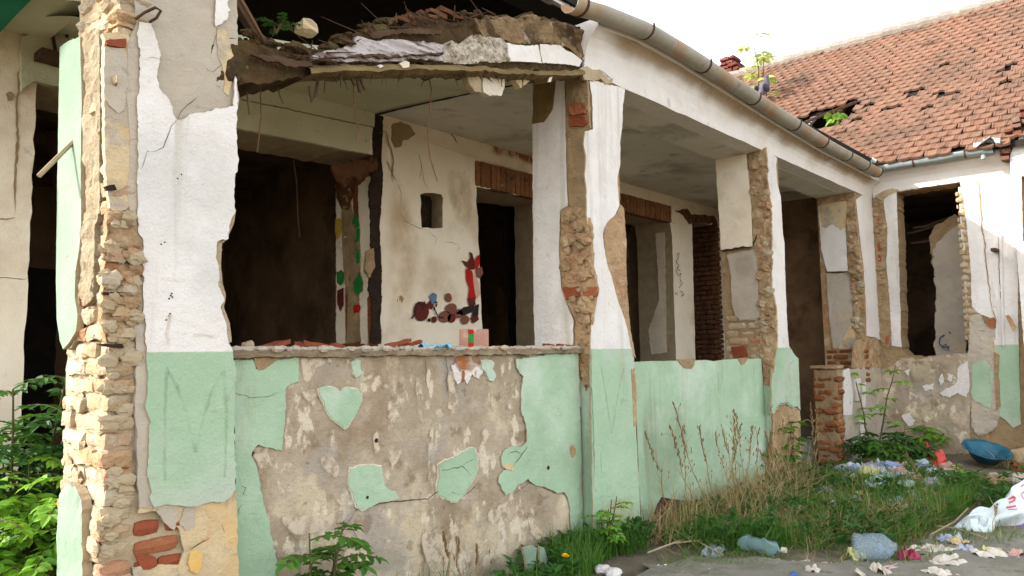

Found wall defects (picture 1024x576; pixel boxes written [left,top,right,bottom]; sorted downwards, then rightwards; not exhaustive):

flaking render [102,39,128,114]
spalling [98,210,148,352]
peeling [252,115,570,576]
spalling [532,66,718,385]
spalling [731,147,778,386]
spalling [819,188,899,436]
peeling [902,412,915,426]
flaking render [131,488,239,576]
crack [347,459,477,550]